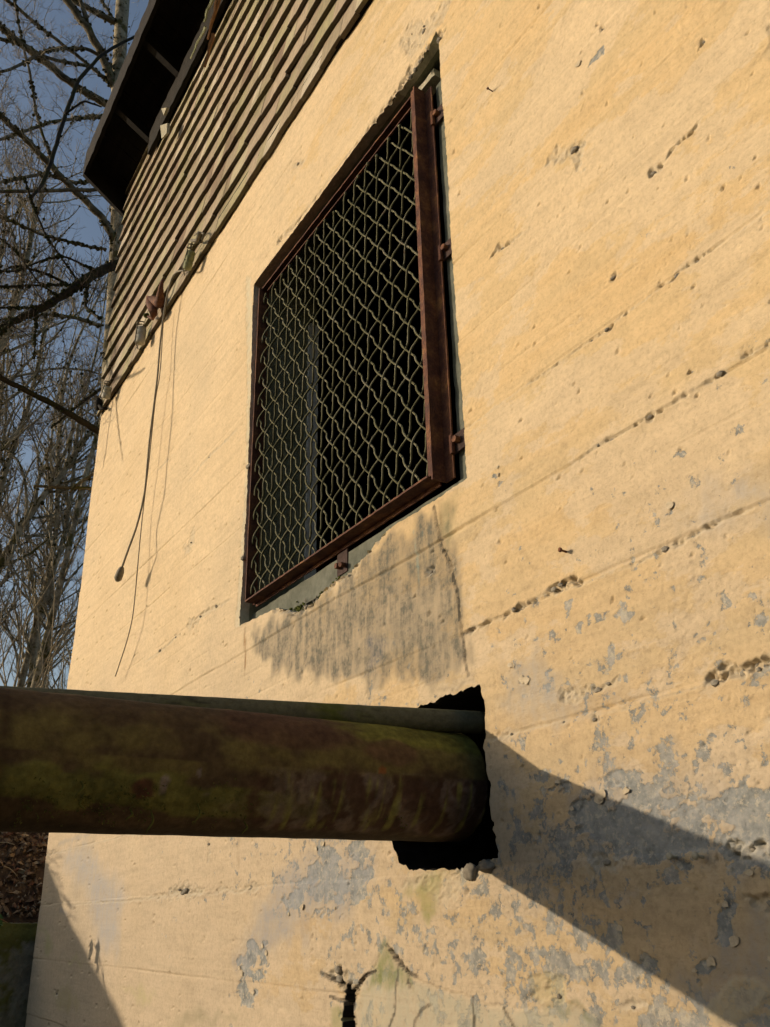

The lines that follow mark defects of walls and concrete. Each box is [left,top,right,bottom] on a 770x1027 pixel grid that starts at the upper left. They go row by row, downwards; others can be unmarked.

spalling [276,0,452,245]
spalling [544,140,587,173]
crack [432,505,477,677]
spalling [702,654,770,688]
peeling [598,769,770,876]
peeling [714,891,770,947]
crack [319,944,432,1027]
peeling [639,955,662,973]